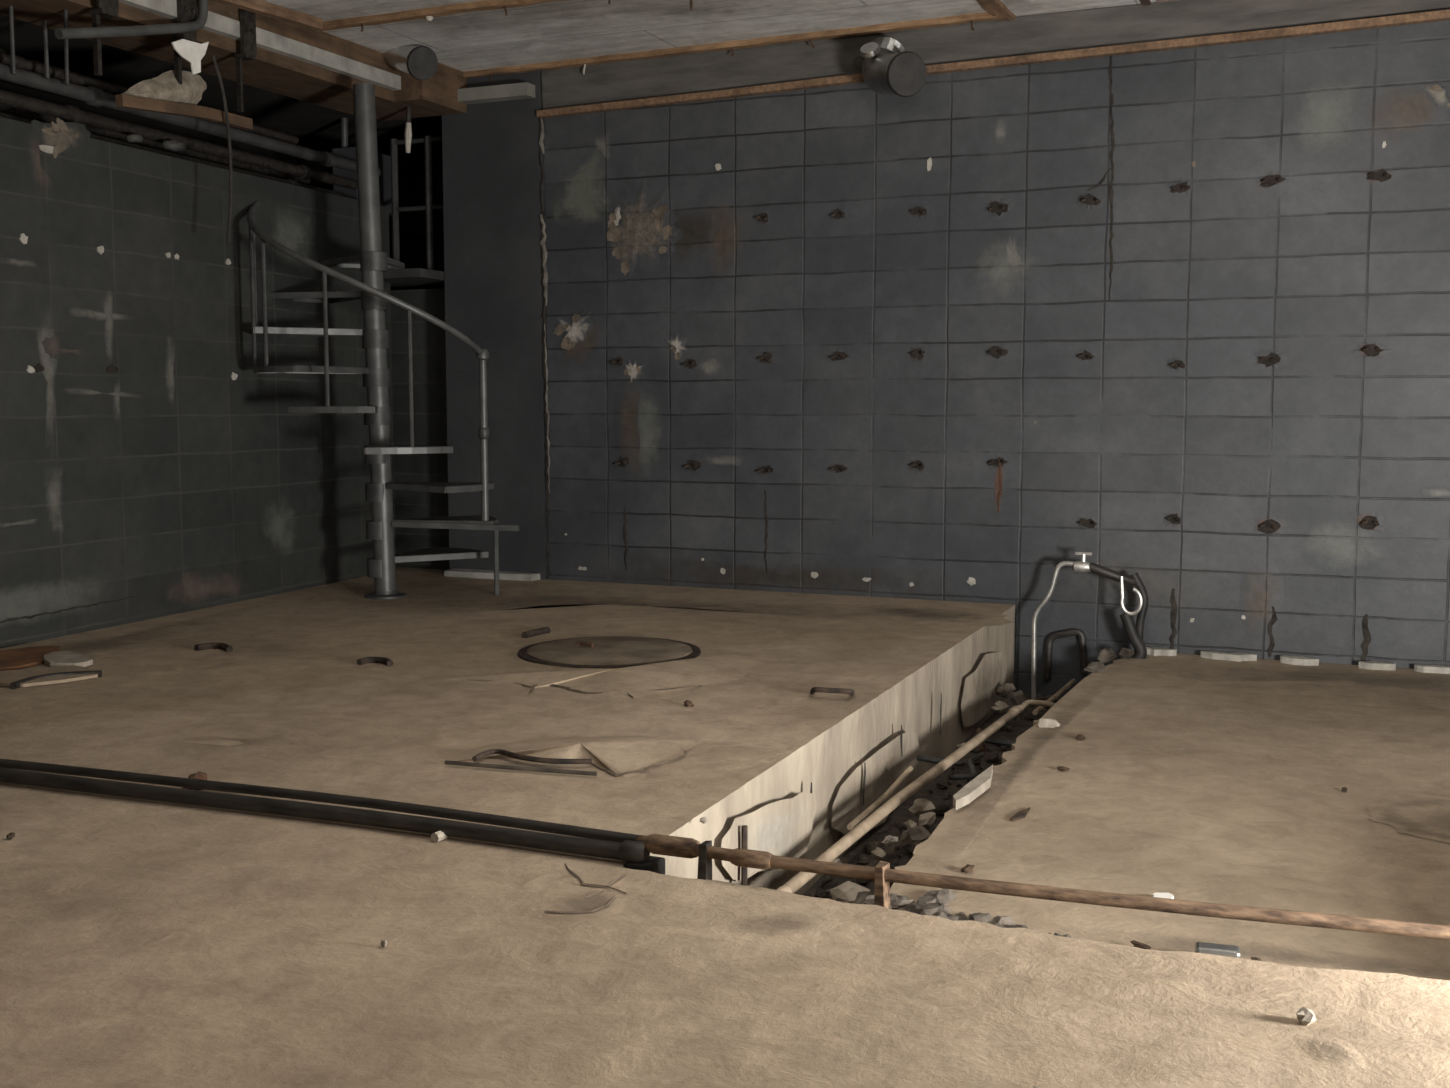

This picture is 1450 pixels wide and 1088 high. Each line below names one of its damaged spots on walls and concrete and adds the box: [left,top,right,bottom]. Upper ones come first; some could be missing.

peeling [31,117,91,158]
spalling [601,178,682,278]
crack [1087,56,1115,302]
peeling [553,309,594,351]
rust [0,645,61,671]
damp [890,652,1450,908]
spalling [936,651,1450,962]